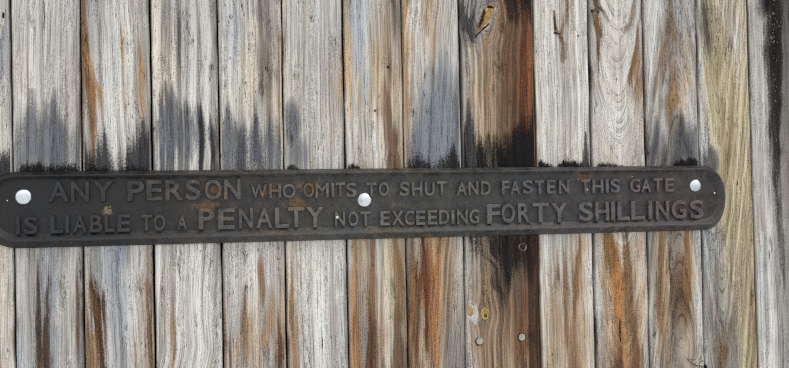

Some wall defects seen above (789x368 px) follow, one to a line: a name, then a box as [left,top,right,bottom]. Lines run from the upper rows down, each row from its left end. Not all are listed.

damp [0,82,308,176]
damp [406,62,534,168]
damp [470,235,536,315]